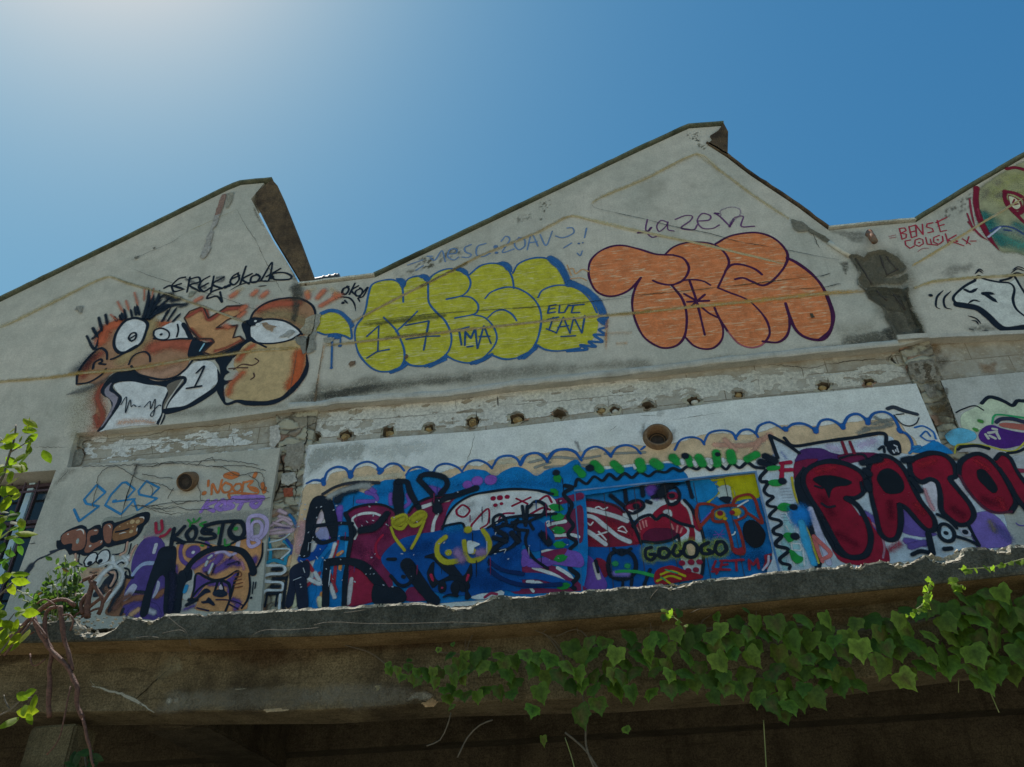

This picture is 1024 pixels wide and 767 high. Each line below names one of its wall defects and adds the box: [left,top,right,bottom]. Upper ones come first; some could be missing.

spalling [850,250,922,339]
crack [90,420,255,517]
peeling [72,358,945,588]
spalling [73,615,162,639]